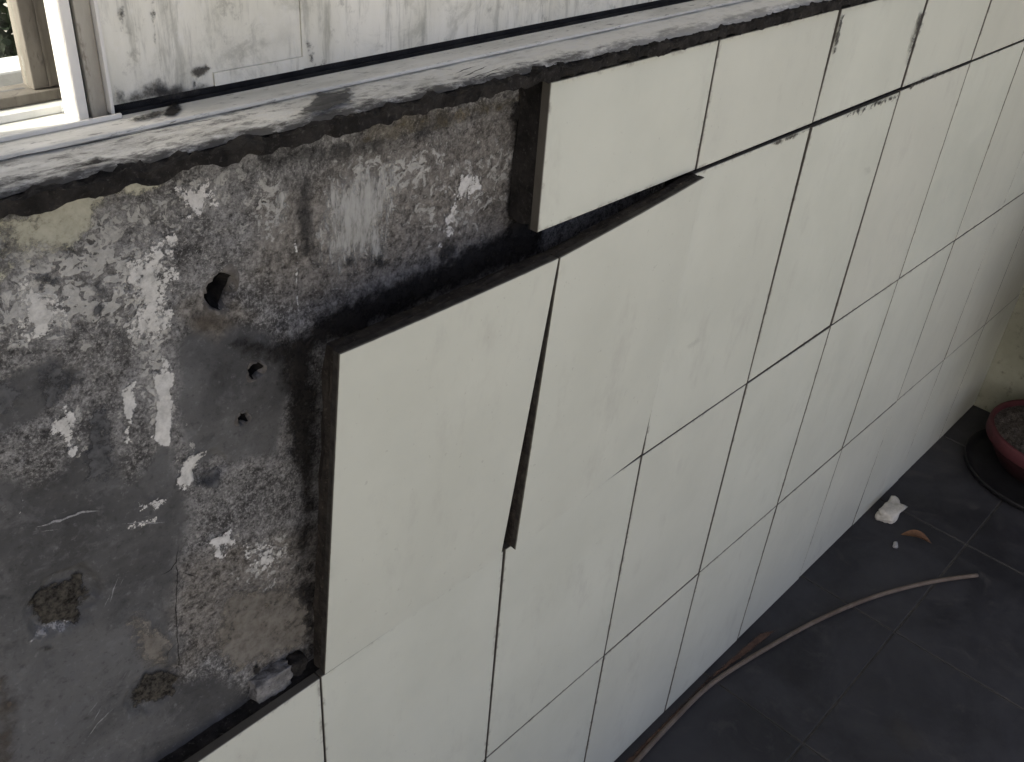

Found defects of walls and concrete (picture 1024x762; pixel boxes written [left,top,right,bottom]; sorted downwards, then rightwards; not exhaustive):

flaking render [0,88,519,762]
water stain [233,101,544,652]
flaking render [367,182,665,326]